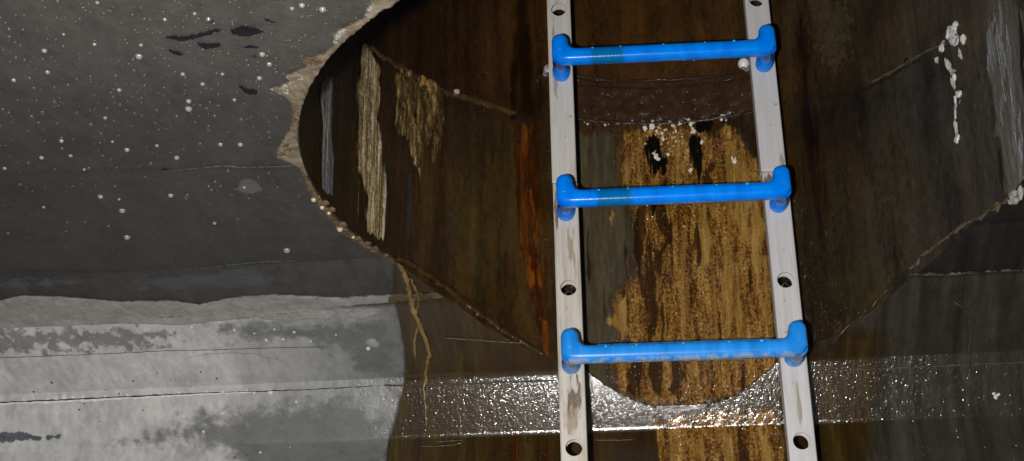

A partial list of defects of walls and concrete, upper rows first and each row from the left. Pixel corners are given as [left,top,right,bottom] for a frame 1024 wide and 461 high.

rust [514,122,551,356]
leakage [174,0,894,461]
leakage [901,0,1024,270]